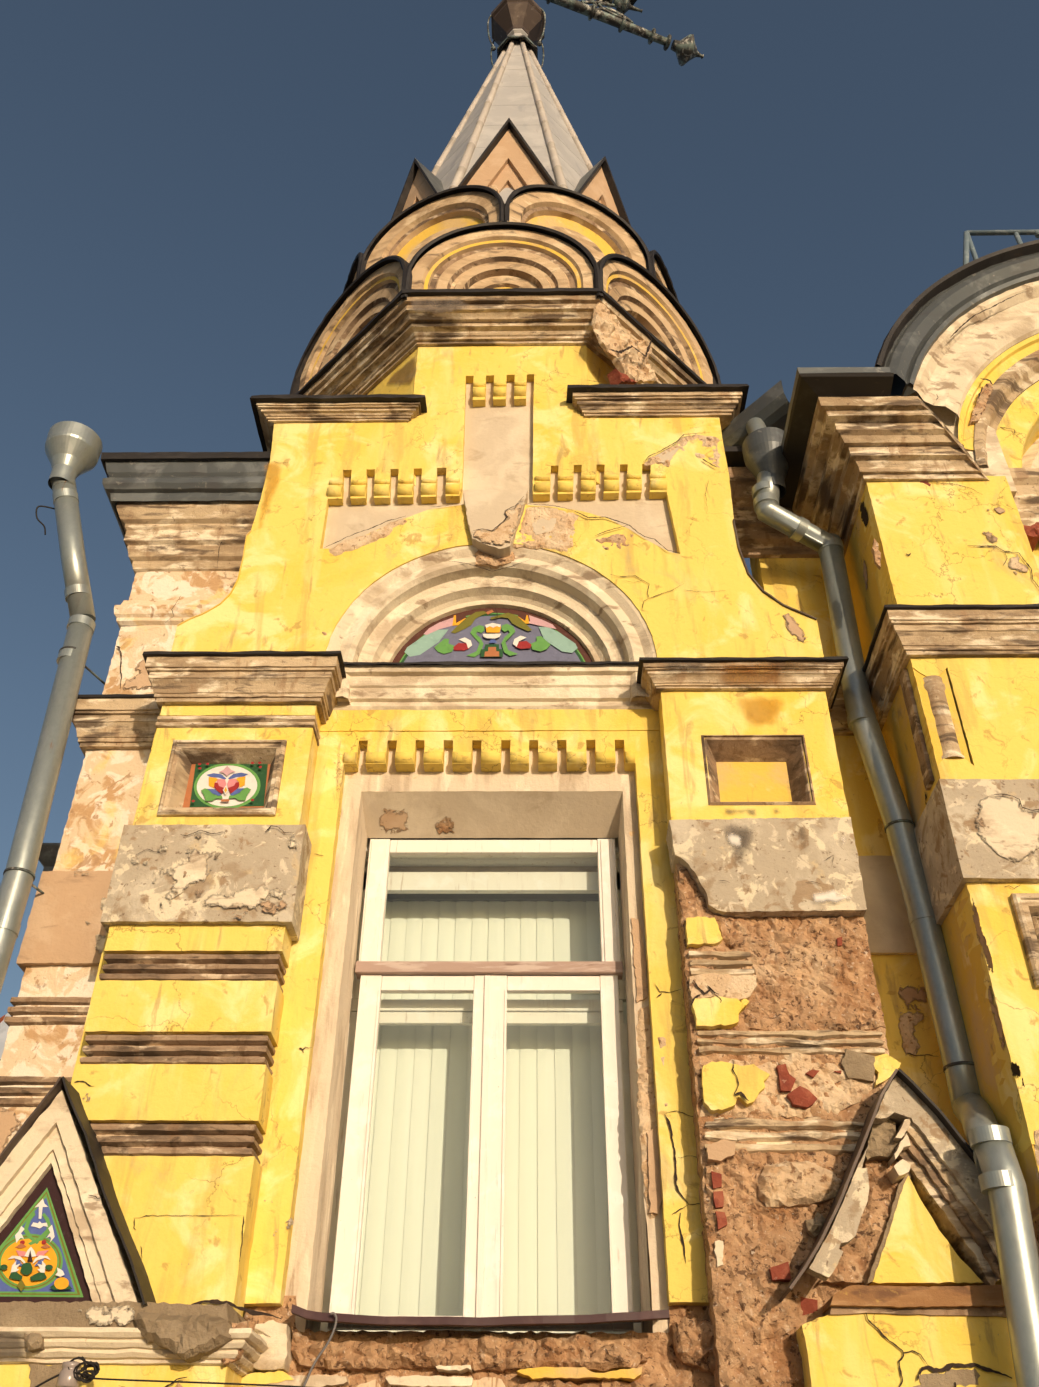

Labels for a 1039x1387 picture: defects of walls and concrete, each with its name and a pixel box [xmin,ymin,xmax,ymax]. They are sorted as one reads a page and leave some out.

flaking render [591,302,658,385]
flaking render [644,434,721,470]
flaking render [473,499,579,569]
peeling [783,613,806,643]
peeling [975,795,1039,862]
peeling [131,833,290,919]
crack [654,980,722,1006]
flaking render [678,863,927,1119]
peeling [0,1107,22,1154]
crack [664,1111,700,1262]
flaking render [705,1139,851,1340]
crack [866,1313,1012,1387]